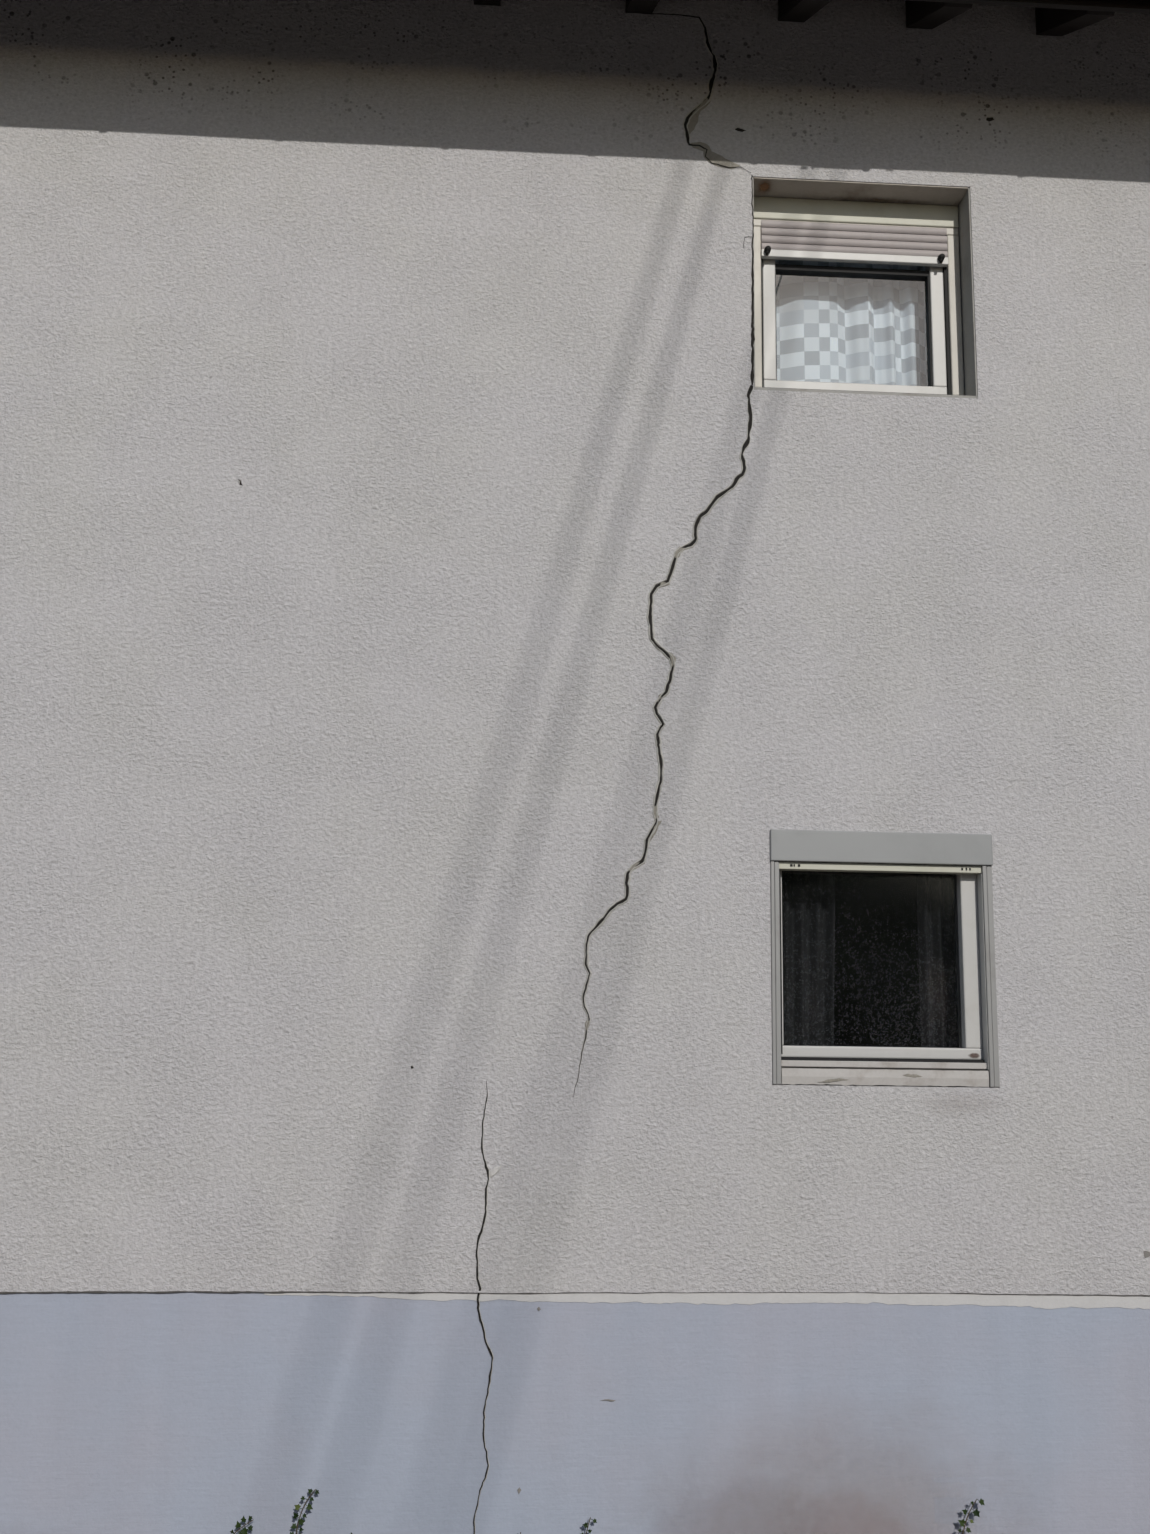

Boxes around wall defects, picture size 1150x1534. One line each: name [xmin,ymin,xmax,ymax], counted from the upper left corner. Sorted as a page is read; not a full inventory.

crack [573,13,755,1097]
crack [0,1081,697,1534]
crack [964,1290,1070,1298]